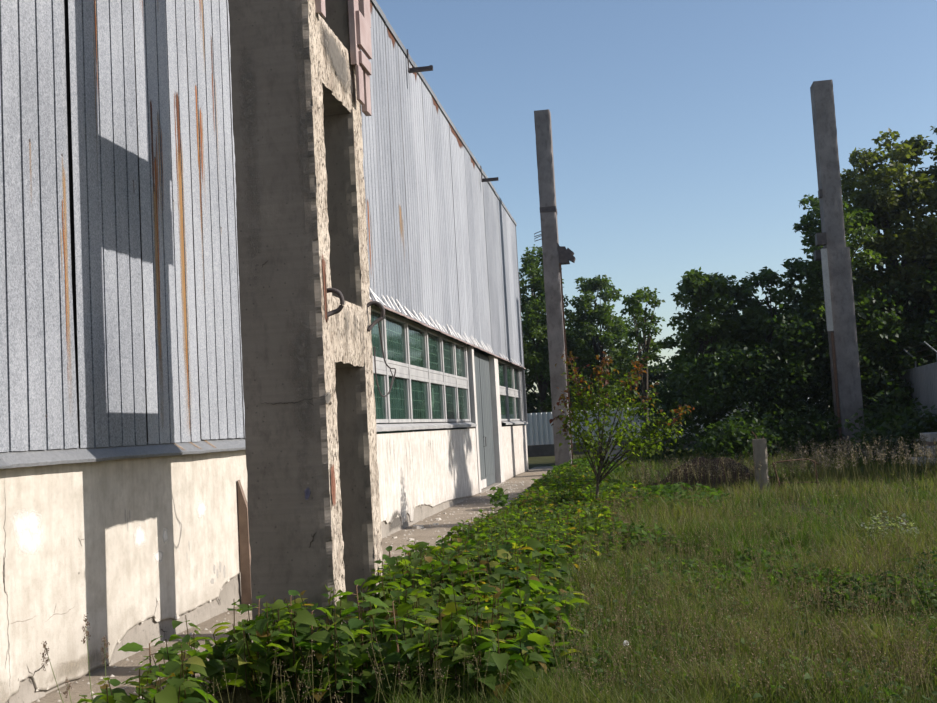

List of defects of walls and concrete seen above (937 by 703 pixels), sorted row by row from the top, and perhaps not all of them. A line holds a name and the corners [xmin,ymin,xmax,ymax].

rust [199,0,218,143]
rust [195,86,205,227]
rust [61,178,69,349]
rust [150,101,164,359]
rust [174,92,190,427]
crack [3,481,65,682]
spalling [109,562,242,666]
spalling [381,497,466,538]
spalling [9,675,49,703]